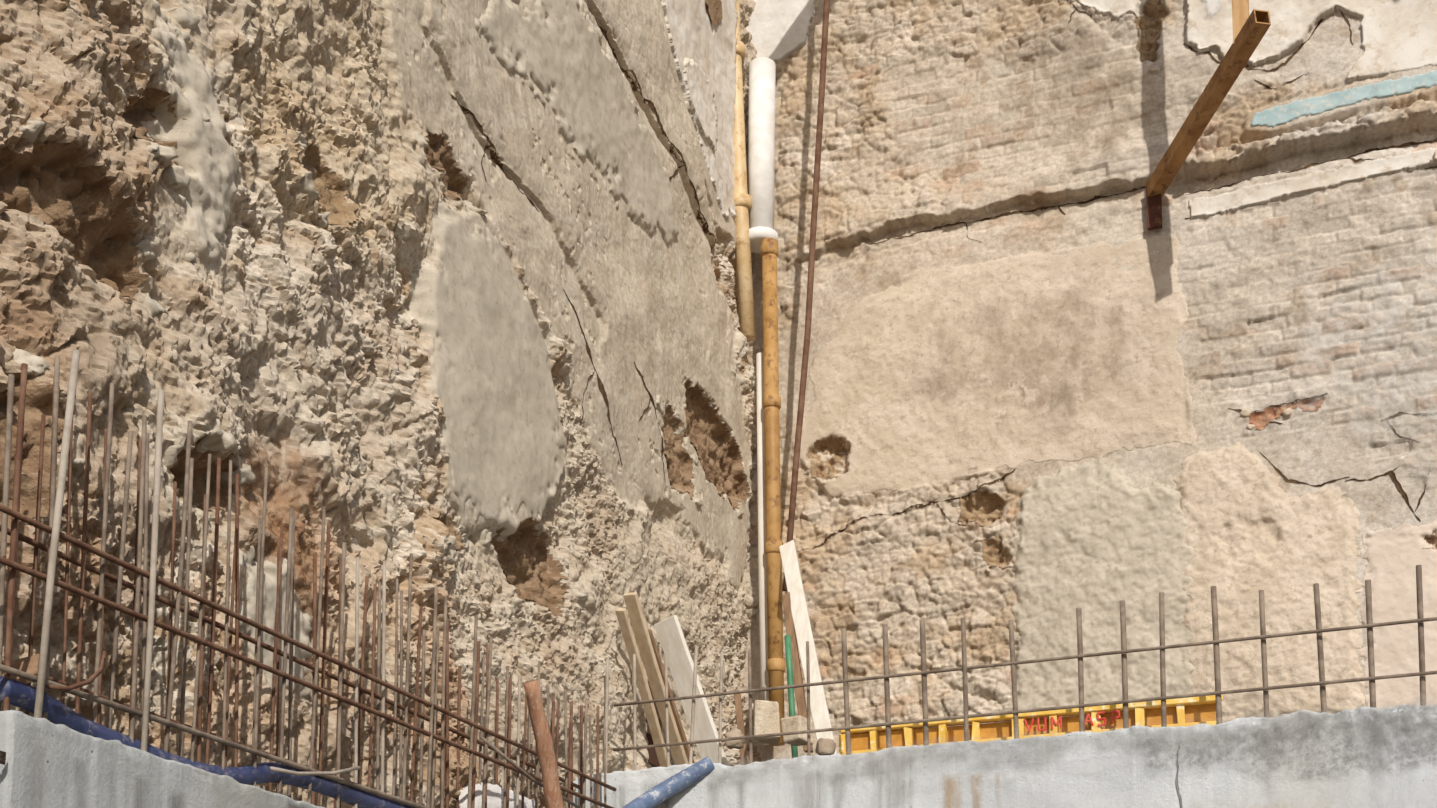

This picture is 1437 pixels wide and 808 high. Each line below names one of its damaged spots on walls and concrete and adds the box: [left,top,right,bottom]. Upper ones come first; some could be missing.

spalling [1059,0,1165,73]
peeling [1186,0,1233,58]
peeling [1247,0,1437,82]
crack [451,94,540,212]
crack [866,186,1145,245]
crack [1185,138,1437,219]
crack [1229,393,1437,522]
spalling [0,349,1437,808]
crack [1175,746,1183,808]